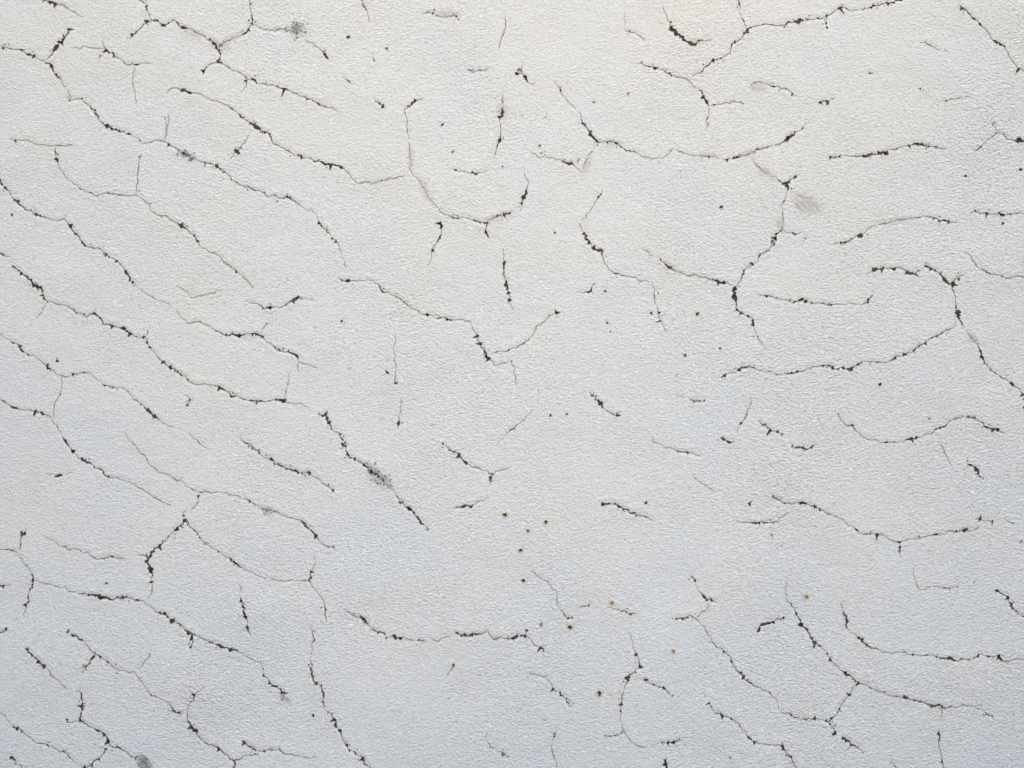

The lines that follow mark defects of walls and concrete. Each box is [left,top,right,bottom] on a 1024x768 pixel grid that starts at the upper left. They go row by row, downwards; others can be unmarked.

crack [0,0,1024,531]
crack [0,334,574,768]
crack [529,571,682,768]
crack [675,576,995,768]
crack [733,495,1014,590]
crack [841,603,1023,662]
crack [995,589,1024,617]